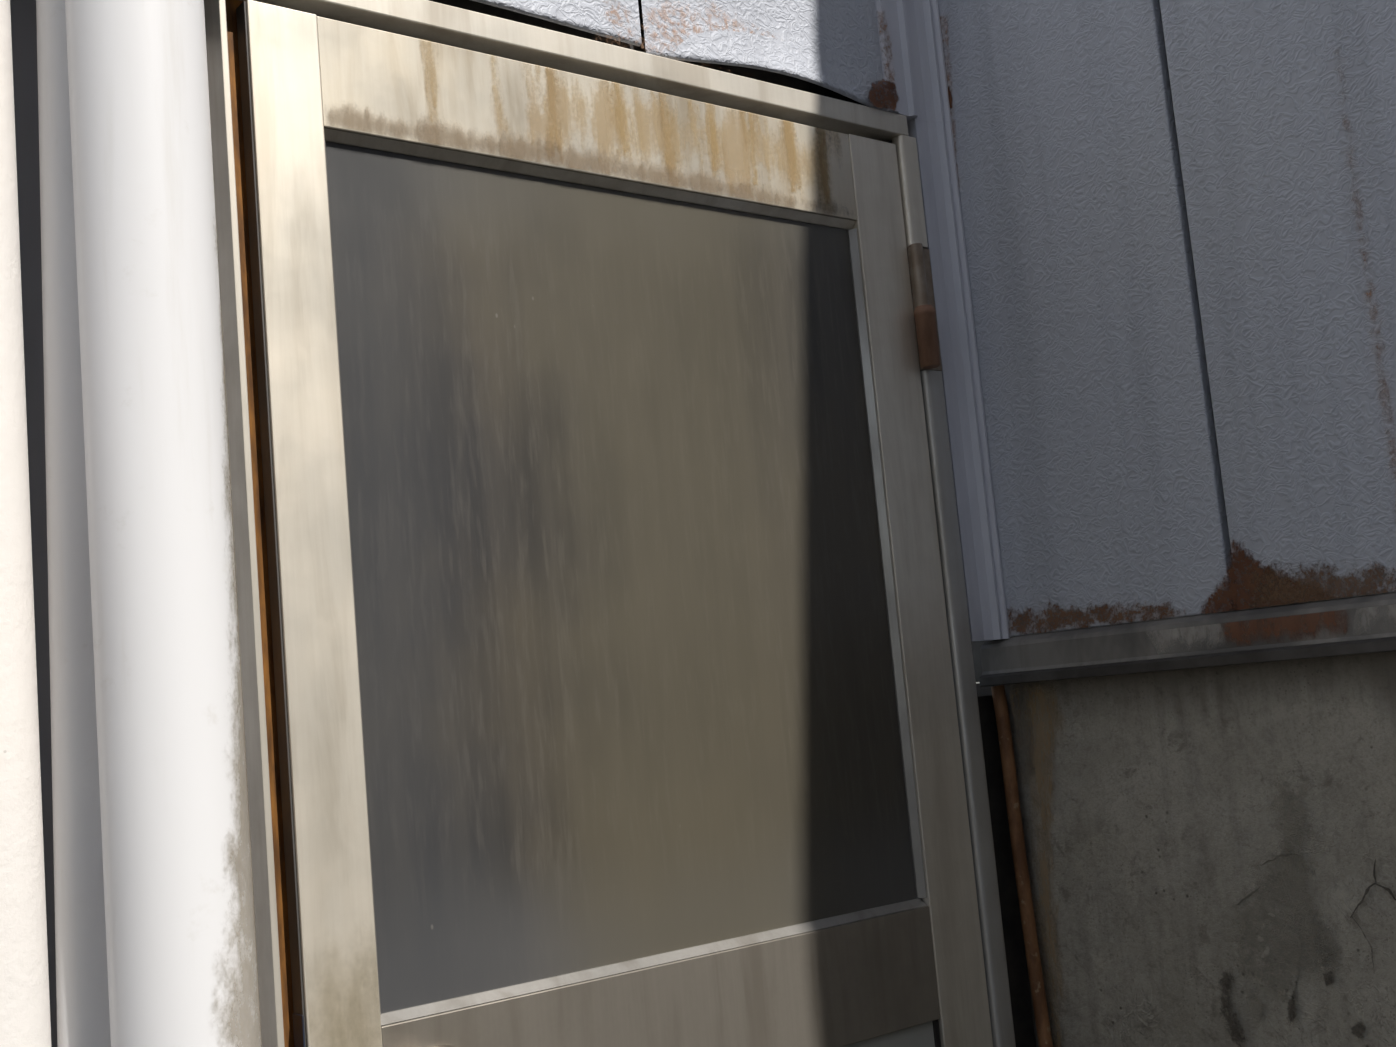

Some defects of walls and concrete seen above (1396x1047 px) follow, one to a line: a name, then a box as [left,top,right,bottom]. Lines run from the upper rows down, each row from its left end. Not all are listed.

rust [331,109,616,172]
rust [1008,540,1396,652]
crack [1350,859,1396,967]